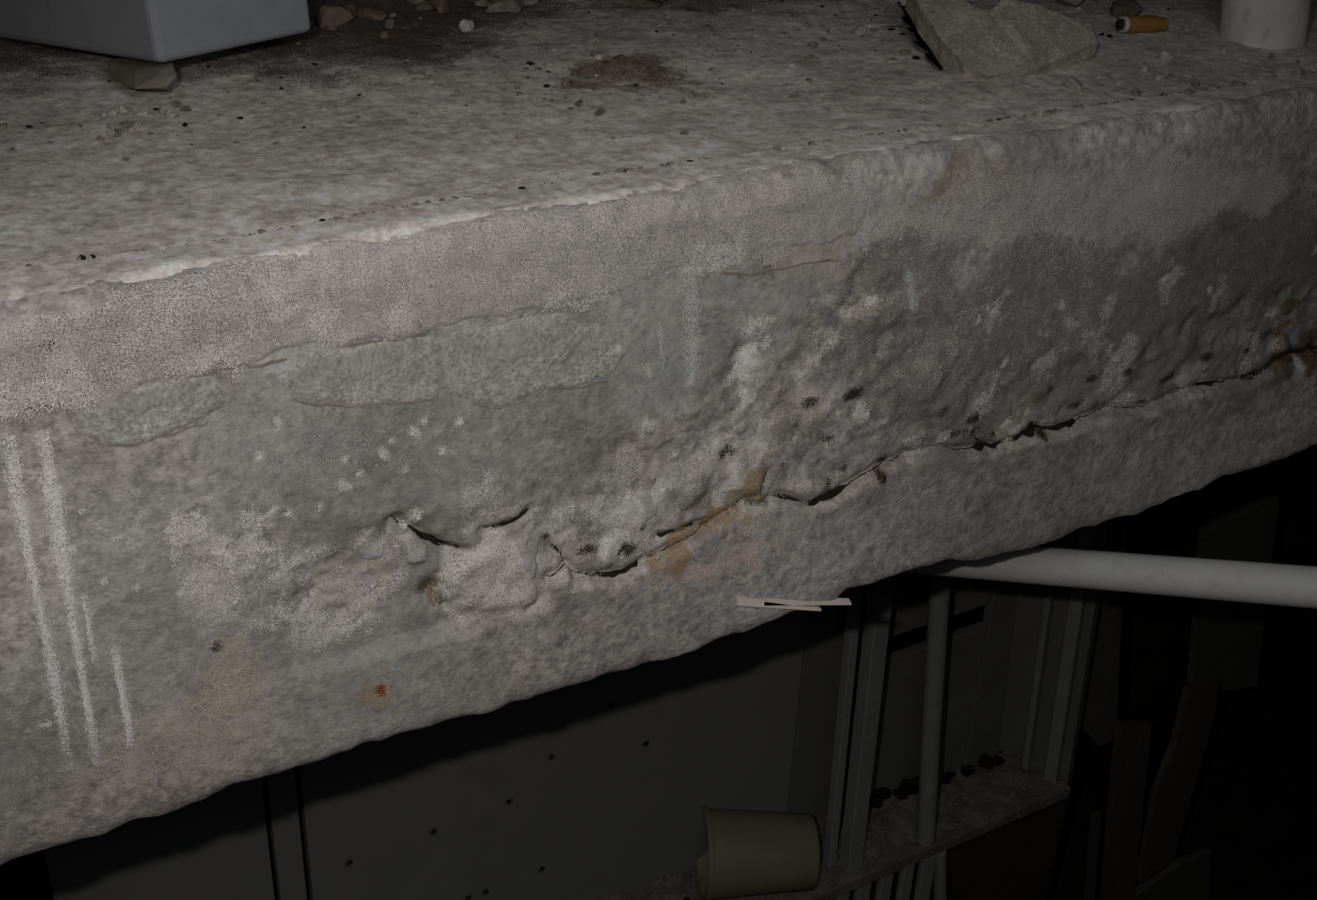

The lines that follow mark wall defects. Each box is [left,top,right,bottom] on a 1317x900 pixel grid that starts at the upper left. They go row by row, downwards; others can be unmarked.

leakage [0,428,304,827]
crack [391,508,529,548]
corrosion [636,460,768,587]
spalling [522,279,897,595]
crack [545,345,1317,577]
spalling [947,412,1049,443]